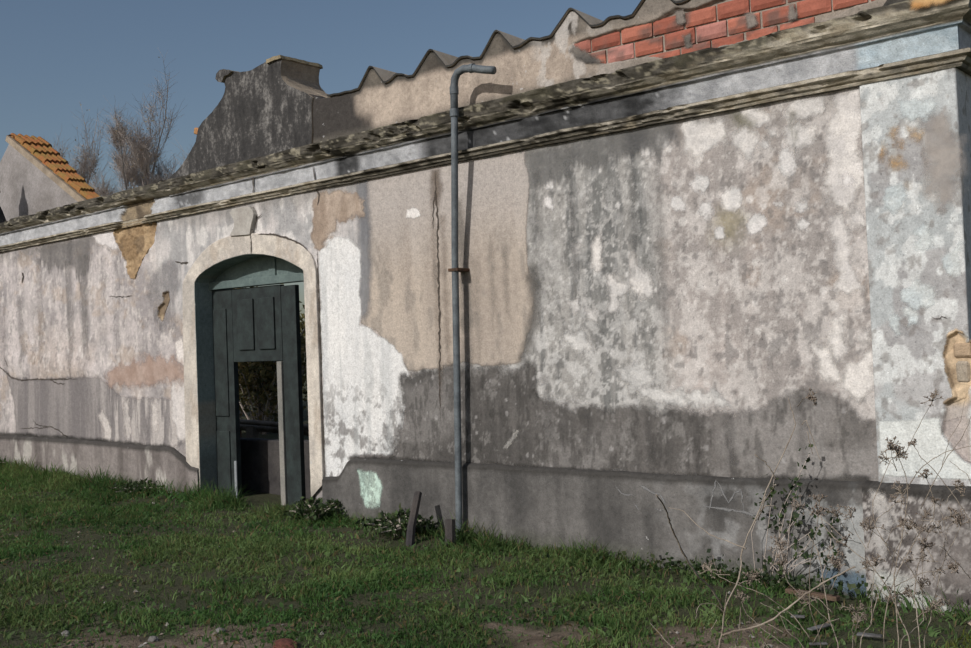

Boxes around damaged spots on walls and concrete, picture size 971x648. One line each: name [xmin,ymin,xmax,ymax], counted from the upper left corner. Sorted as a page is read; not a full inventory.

flaking render [90,222,157,279]
damp [458,203,470,331]
crack [0,358,75,385]
flaking render [108,338,185,440]
flaking render [158,291,170,321]
peeling [310,190,409,477]
damp [349,268,879,512]
flaking render [943,329,971,404]
peeling [357,470,382,507]